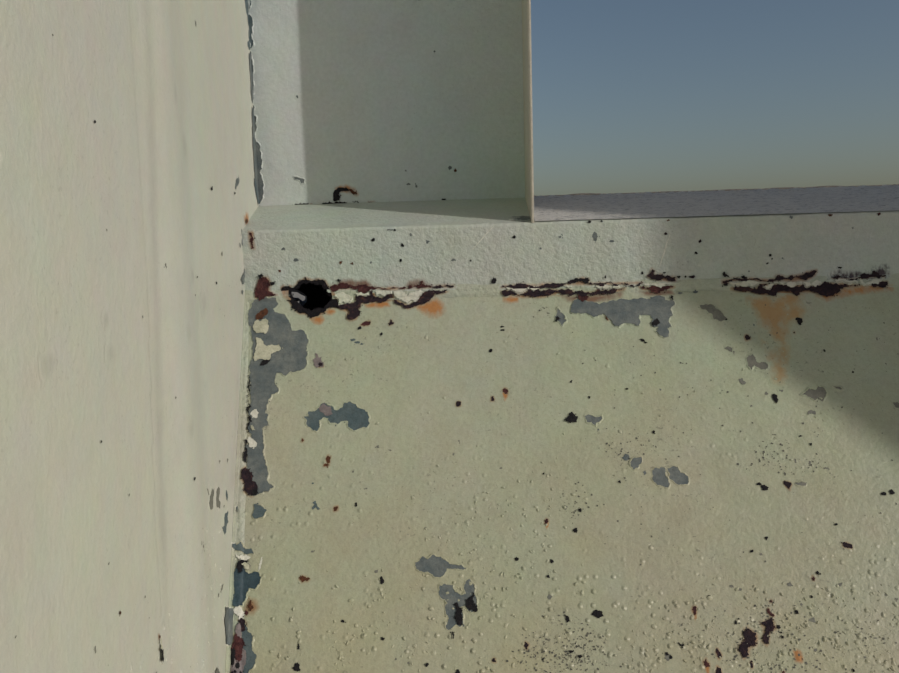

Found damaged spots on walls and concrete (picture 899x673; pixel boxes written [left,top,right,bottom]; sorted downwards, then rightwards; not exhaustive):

corrosion [333,183,361,201]
corrosion [252,270,458,335]
corrosion [491,265,695,306]
peeling [553,292,682,339]
peeling [698,303,729,323]
corrosion [718,262,897,403]
peeling [245,296,325,520]
peeling [302,400,371,433]
peeling [622,454,690,489]
peeling [207,485,262,673]
peeling [414,553,479,639]
corrosion [700,645,725,673]